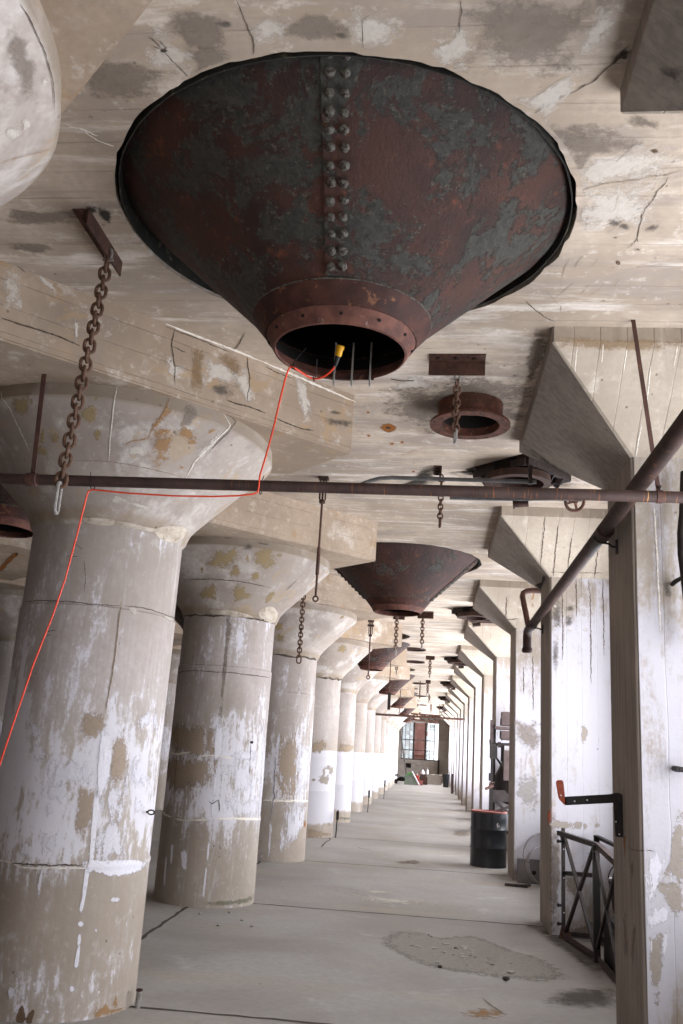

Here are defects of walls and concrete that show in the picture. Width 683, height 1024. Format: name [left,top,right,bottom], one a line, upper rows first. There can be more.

damp [90,13,224,98]
damp [478,2,615,114]
crack [584,170,681,248]
crack [124,327,291,453]
peeling [200,548,281,602]
peeling [82,713,106,738]
peeling [75,730,148,864]
peeling [166,724,217,793]
peeling [312,765,334,785]
crack [12,860,83,868]
peeling [645,810,683,1006]
spalling [384,932,563,981]